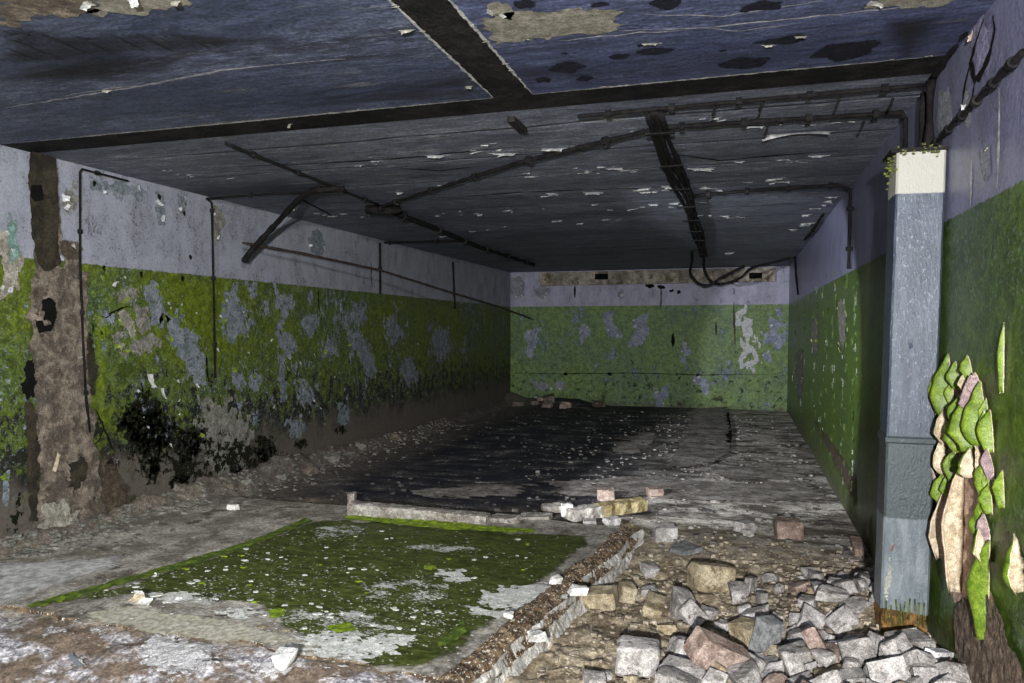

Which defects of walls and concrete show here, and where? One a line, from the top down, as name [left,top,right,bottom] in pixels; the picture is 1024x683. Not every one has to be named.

damp [649,0,681,10]
damp [740,0,782,13]
flaking render [448,0,934,94]
damp [718,34,807,69]
damp [810,40,882,62]
peeling [603,186,682,221]
spalling [0,173,455,529]
peeling [729,271,859,491]
damp [100,383,308,514]
peeling [935,442,984,461]
damp [410,464,833,503]
spalling [932,478,1024,683]